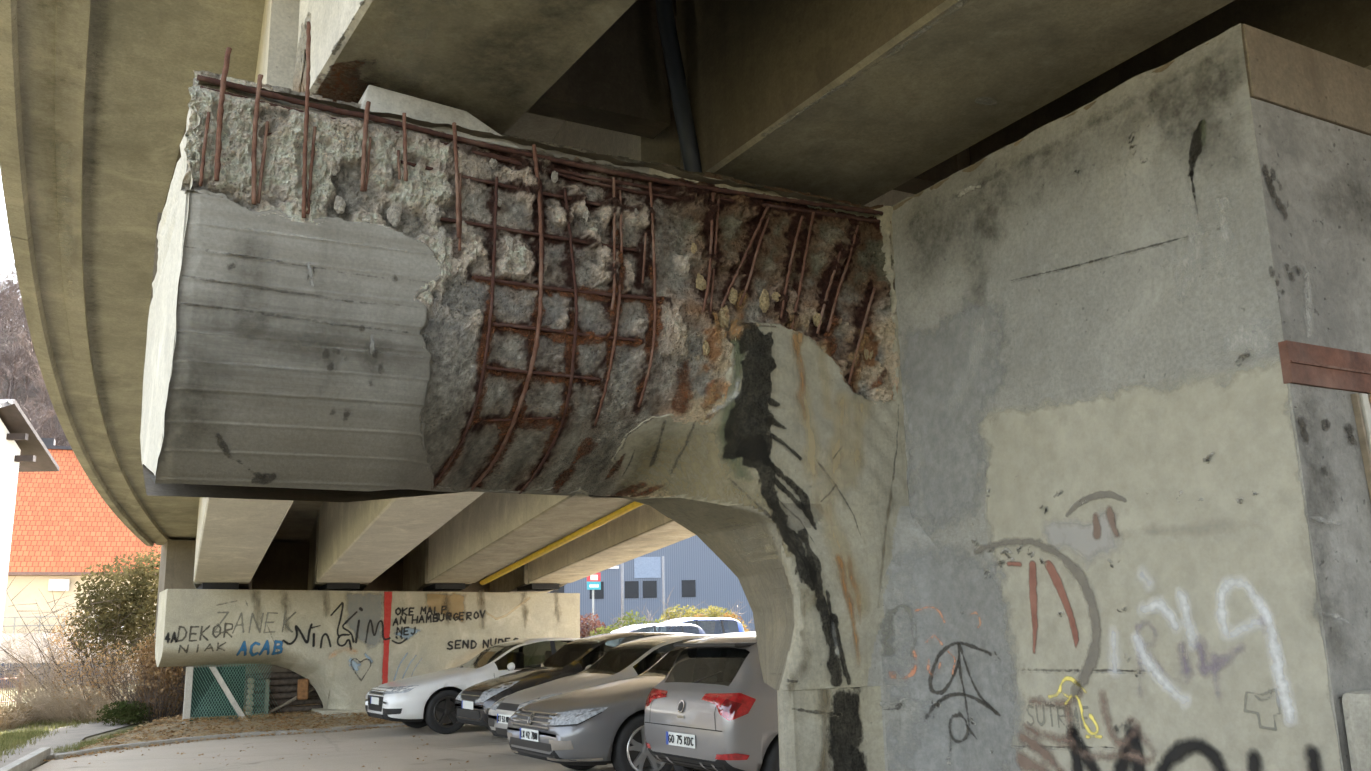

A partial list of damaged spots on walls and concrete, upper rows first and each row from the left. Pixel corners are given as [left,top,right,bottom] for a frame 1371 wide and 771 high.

corrosion [311,60,380,103]
spalling [180,70,900,498]
corrosion [434,229,665,497]
corrosion [671,361,739,424]
corrosion [824,316,887,393]
damp [1181,120,1205,296]